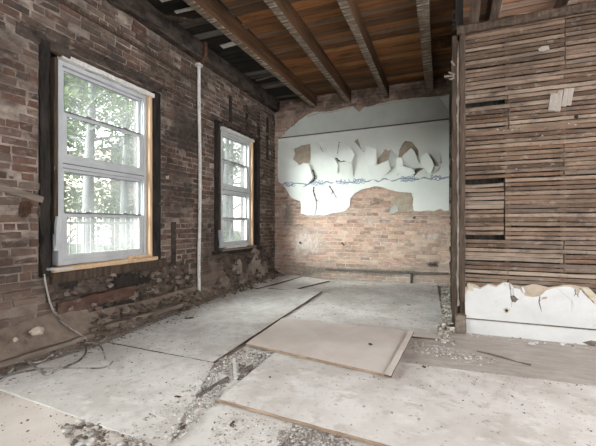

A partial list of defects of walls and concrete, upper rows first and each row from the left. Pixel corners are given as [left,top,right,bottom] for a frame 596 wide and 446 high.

peeling [278,140,355,184]
peeling [358,139,441,178]
crack [304,170,318,213]
peeling [389,193,416,219]
spalling [46,261,196,313]
peeling [505,282,547,302]
peeling [581,288,596,303]